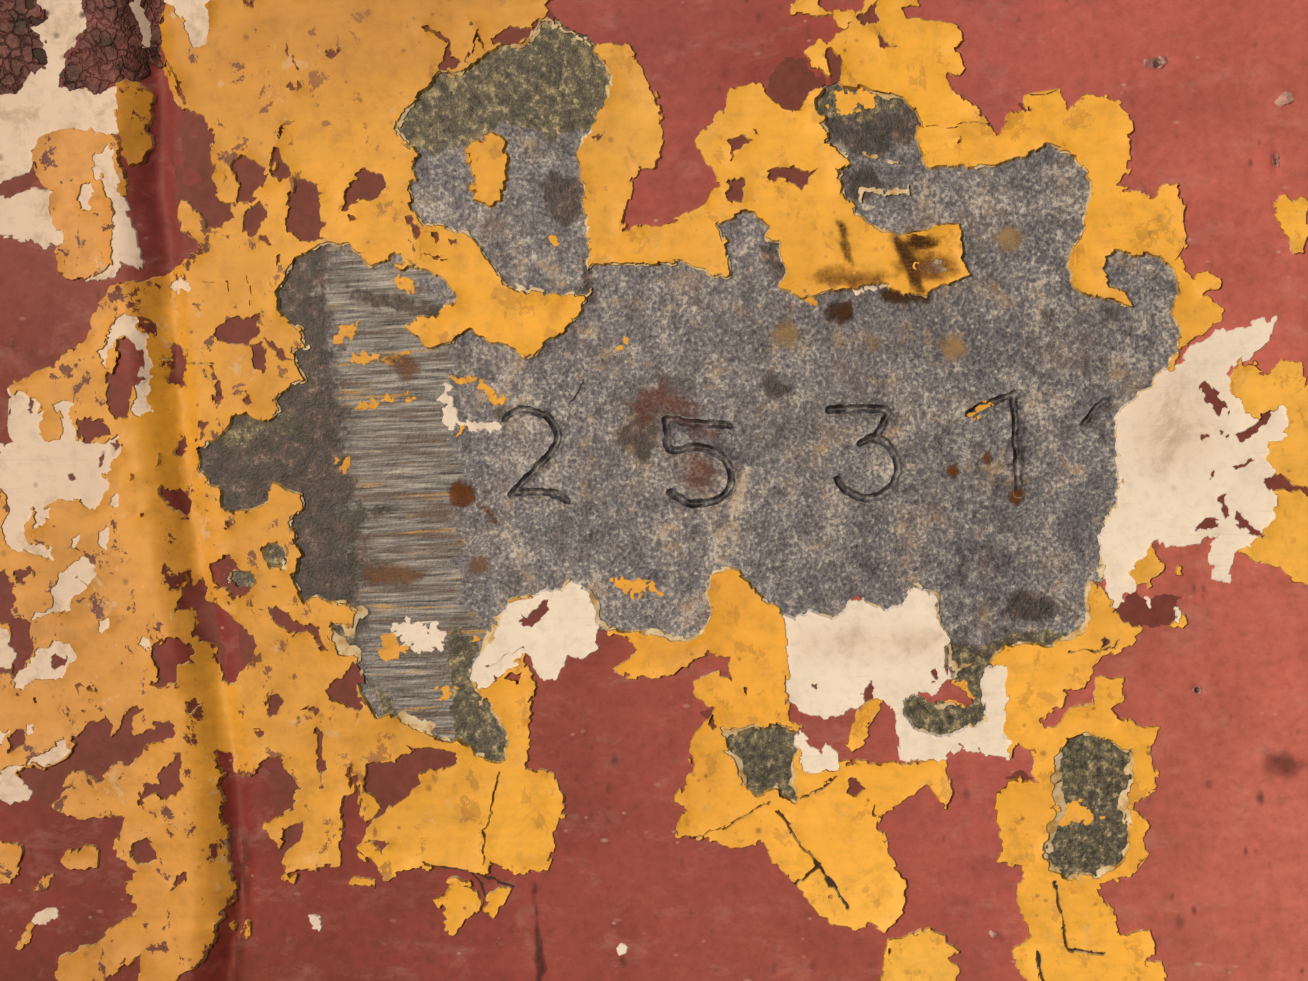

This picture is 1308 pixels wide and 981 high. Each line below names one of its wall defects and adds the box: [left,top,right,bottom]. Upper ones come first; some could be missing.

crack [26,0,48,64]
peeling [576,0,1224,372]
peeling [1273,194,1308,255]
peeling [0,0,588,981]
rust [449,481,496,522]
rust [1009,490,1024,505]
peeling [1196,358,1308,586]
crack [435,772,515,899]
crack [689,778,849,909]
peeling [607,566,961,981]
peeling [989,544,1188,981]
crack [1037,881,1106,981]